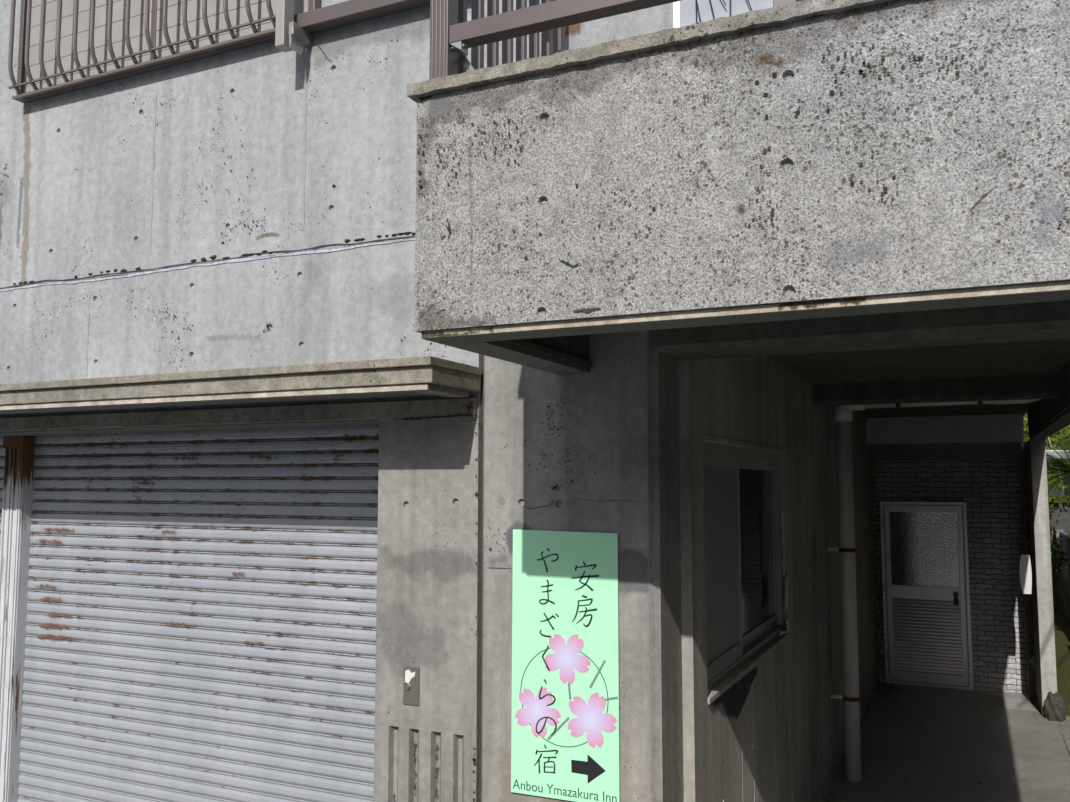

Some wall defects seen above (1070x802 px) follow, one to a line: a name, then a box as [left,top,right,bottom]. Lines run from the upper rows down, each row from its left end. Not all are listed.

crack [0,232,415,291]
rust [39,528,74,544]
rust [36,584,75,641]